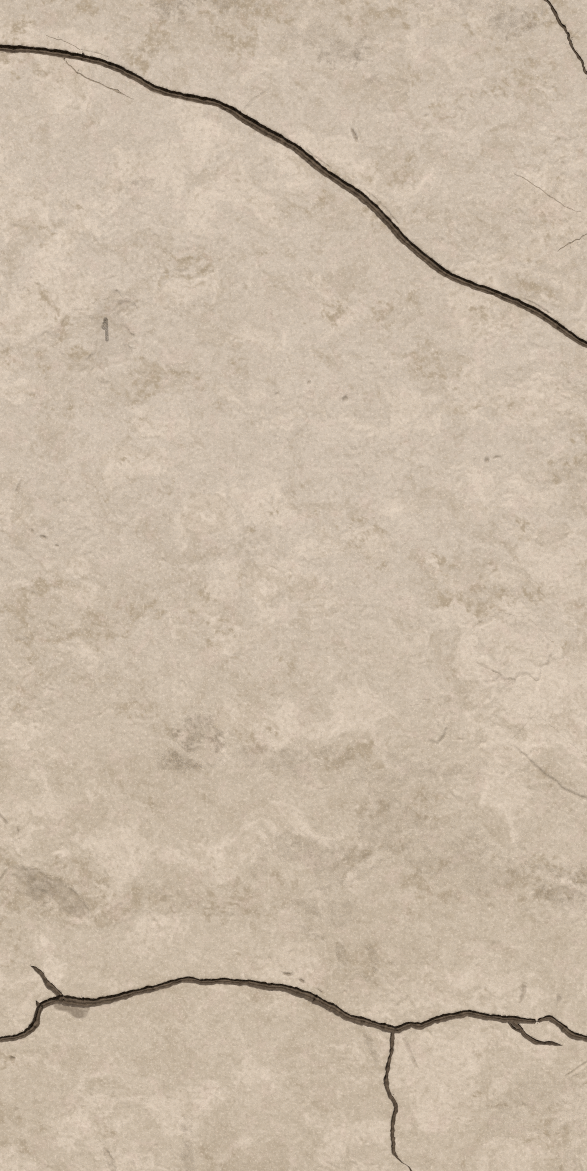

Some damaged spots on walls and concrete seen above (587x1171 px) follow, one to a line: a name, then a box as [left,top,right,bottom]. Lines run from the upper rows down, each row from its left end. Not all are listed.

crack [544,0,587,75]
crack [0,35,587,348]
crack [0,966,587,1171]